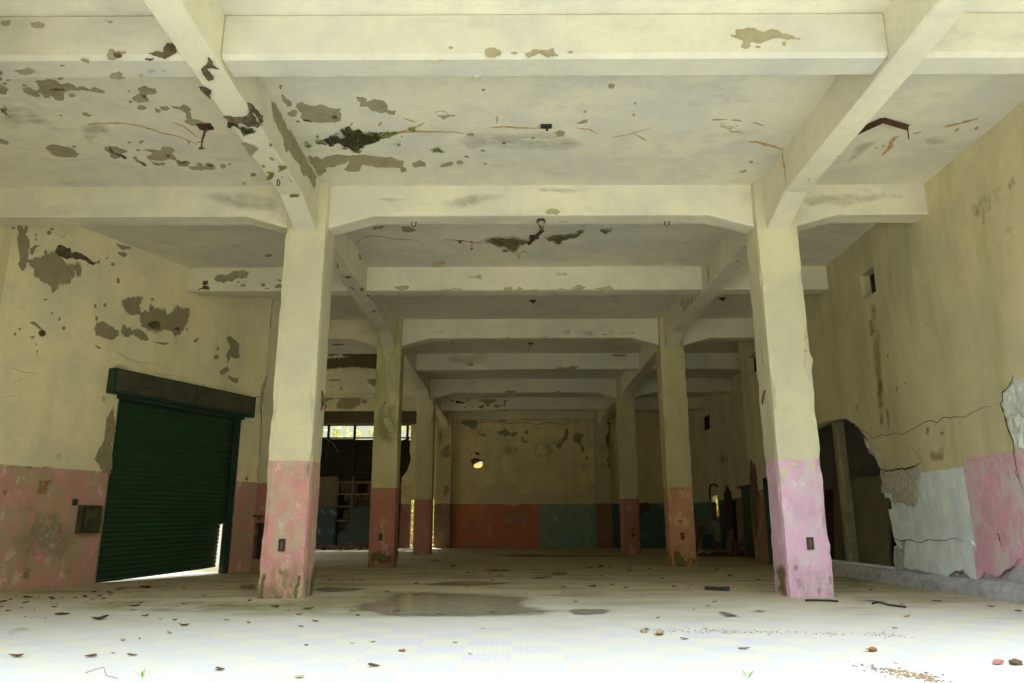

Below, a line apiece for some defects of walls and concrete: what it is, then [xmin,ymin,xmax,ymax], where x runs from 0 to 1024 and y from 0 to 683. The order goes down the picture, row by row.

peeling [730,27,801,49]
peeling [223,85,426,189]
peeling [11,226,131,300]
peeling [94,296,199,349]
peeling [214,336,240,383]
peeling [94,407,116,474]
spalling [864,438,921,507]
crack [853,376,1022,487]
spalling [1000,379,1024,449]
spalling [893,541,928,574]